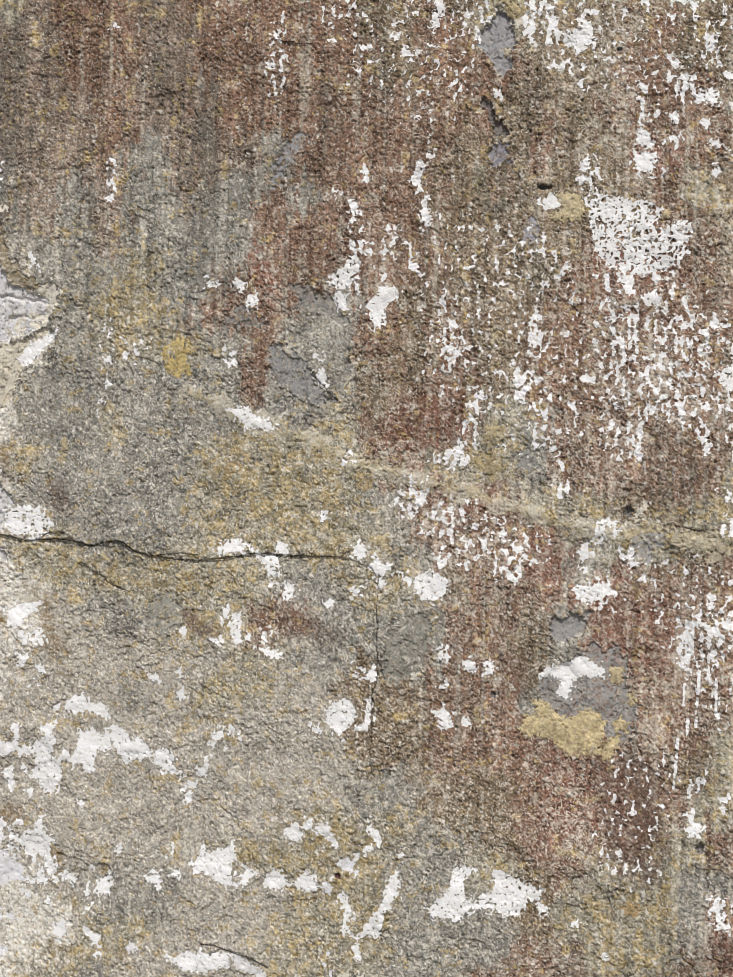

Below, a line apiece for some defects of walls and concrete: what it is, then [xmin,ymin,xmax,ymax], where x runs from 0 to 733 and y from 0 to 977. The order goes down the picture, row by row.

peeling [105,157,117,203]
flaking render [0,204,63,412]
peeling [285,0,733,499]
peeling [0,690,248,805]
crack [5,532,385,771]
peeling [308,696,376,742]
peeling [348,473,552,685]
peeling [430,702,472,731]
rust [603,605,625,633]
flaking render [536,487,733,892]
rust [598,759,660,880]
peeling [423,863,549,923]